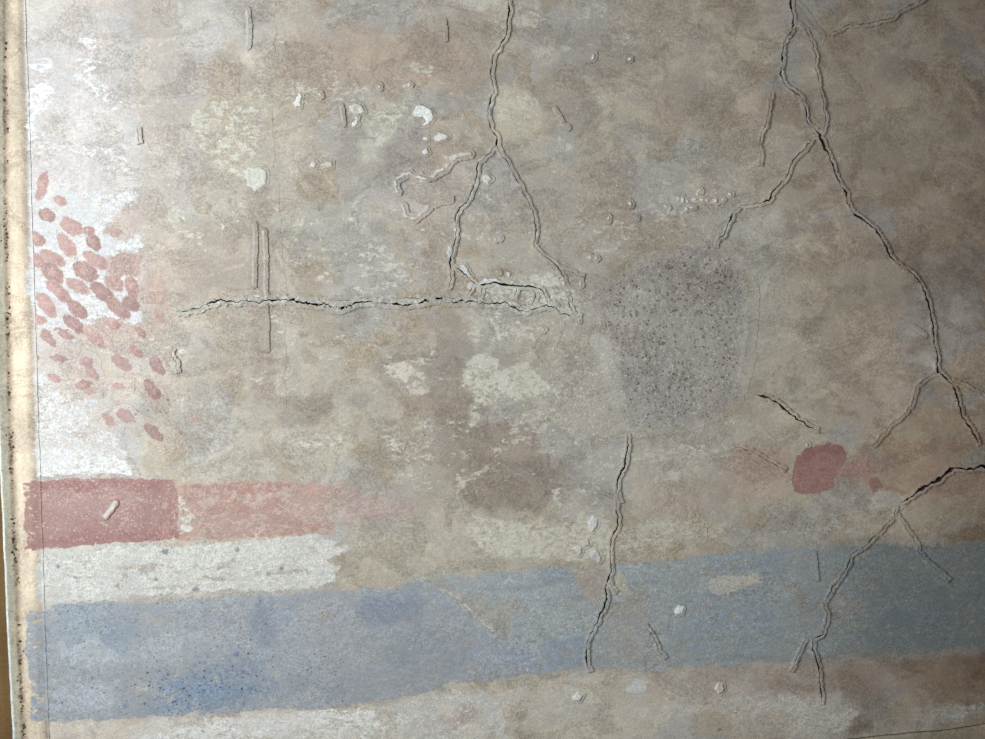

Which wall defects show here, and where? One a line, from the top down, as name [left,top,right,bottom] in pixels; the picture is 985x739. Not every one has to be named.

crack [175,0,585,322]
crack [713,0,985,705]
crack [582,434,632,673]